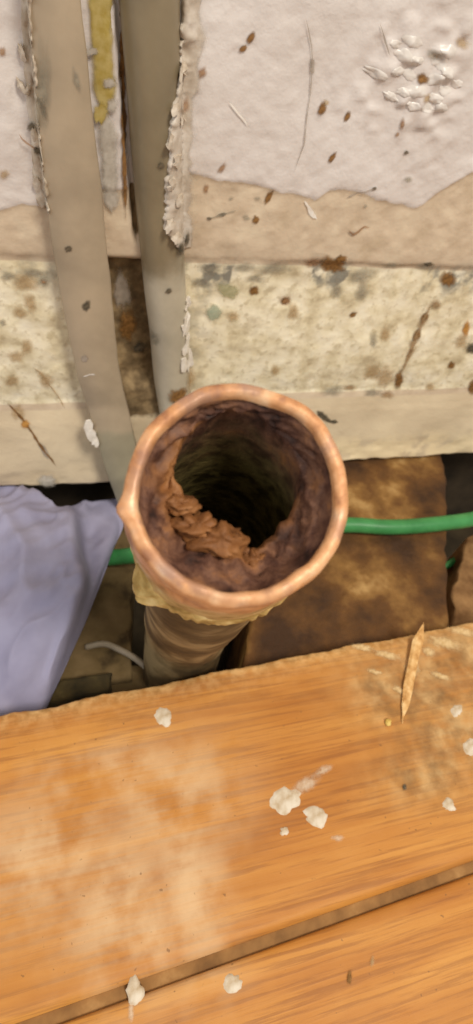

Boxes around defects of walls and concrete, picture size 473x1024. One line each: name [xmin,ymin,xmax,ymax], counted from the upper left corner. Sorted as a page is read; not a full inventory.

peeling [16,0,50,214]
peeling [162,0,206,254]
leakage [4,271,47,316]
leakage [208,285,238,320]
rust [367,302,440,397]